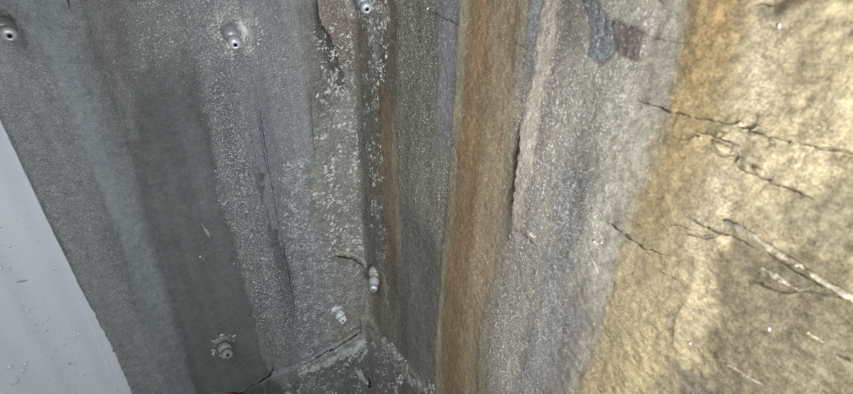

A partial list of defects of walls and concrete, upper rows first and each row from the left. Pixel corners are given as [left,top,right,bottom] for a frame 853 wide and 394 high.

leakage [21,0,438,394]
rust [435,0,529,394]
crack [599,219,694,345]
crack [638,101,853,201]
crack [672,215,846,300]
crack [212,332,361,394]